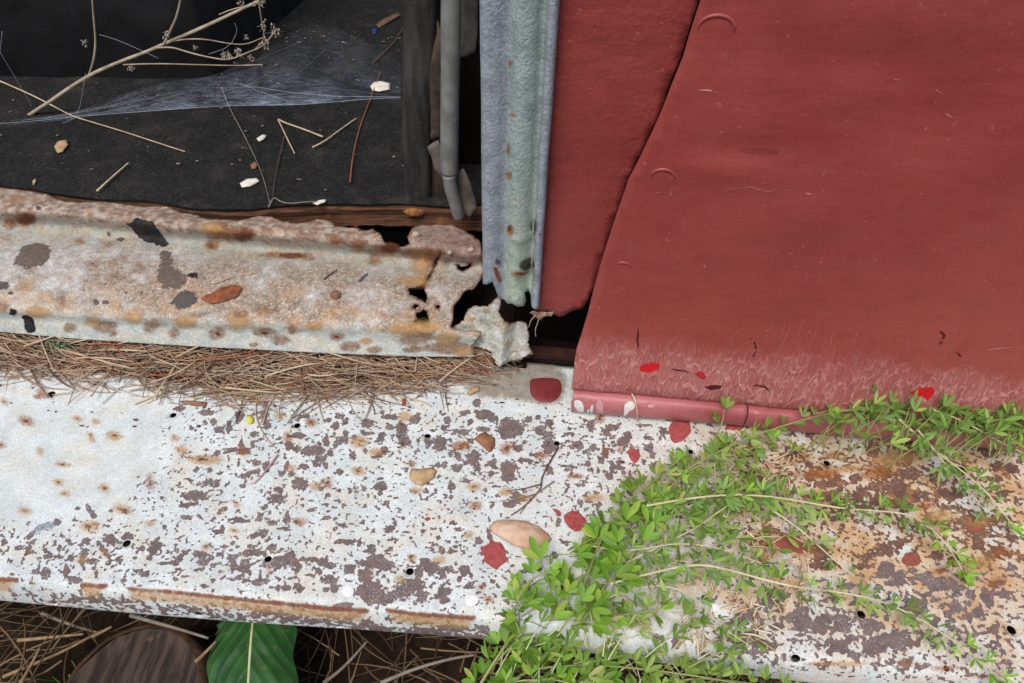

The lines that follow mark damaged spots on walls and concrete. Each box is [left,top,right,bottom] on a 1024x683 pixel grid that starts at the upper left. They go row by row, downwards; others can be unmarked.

rust [4,213,35,228]
rust [202,223,253,249]
rust [352,240,442,284]
rust [512,257,534,276]
rust [65,319,116,335]
rust [171,313,205,337]
rust [212,312,294,346]
rust [332,334,380,353]
peeling [0,390,1024,683]
rust [0,577,34,590]
rust [81,583,107,595]
rust [128,587,369,619]